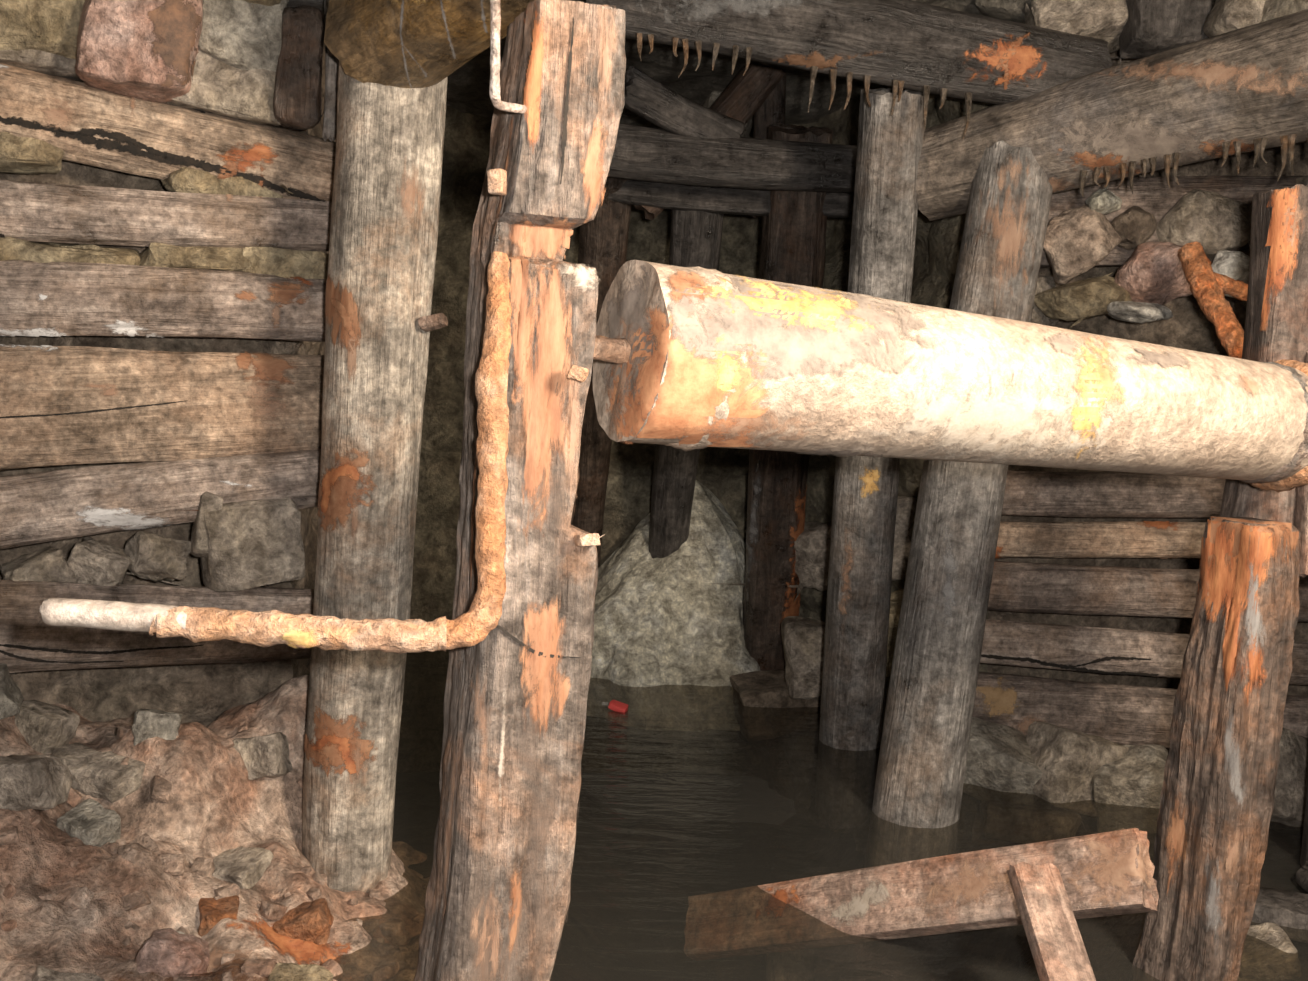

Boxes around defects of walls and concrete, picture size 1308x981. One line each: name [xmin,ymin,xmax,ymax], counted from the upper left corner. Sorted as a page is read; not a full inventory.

rust [773,51,882,70]
crack [0,116,326,202]
rust [1057,148,1141,178]
rust [235,275,362,378]
rust [235,351,295,418]